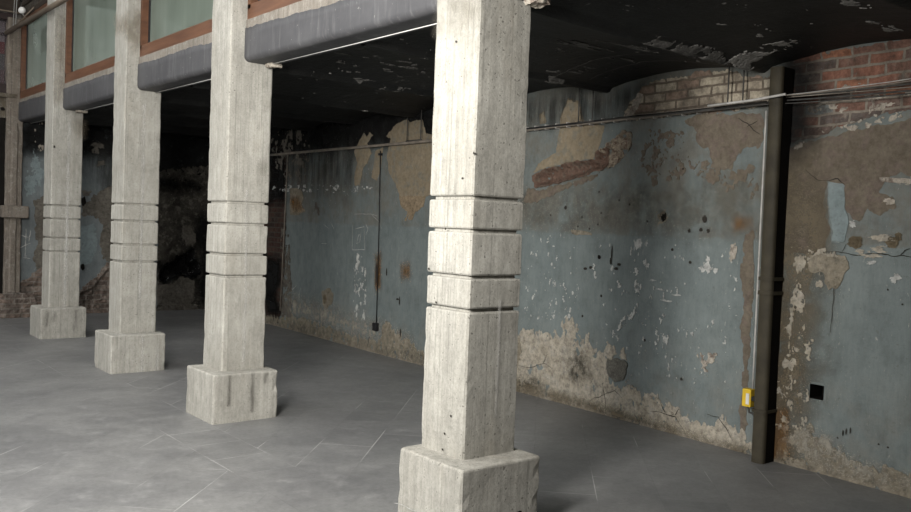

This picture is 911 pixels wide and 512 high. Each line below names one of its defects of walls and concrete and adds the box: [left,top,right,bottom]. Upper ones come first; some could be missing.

peeling [523,24,798,203]
peeling [840,0,872,9]
flaking render [264,120,432,366]
flaking render [516,212,755,454]
flaking render [774,21,911,499]
crack [825,245,910,257]